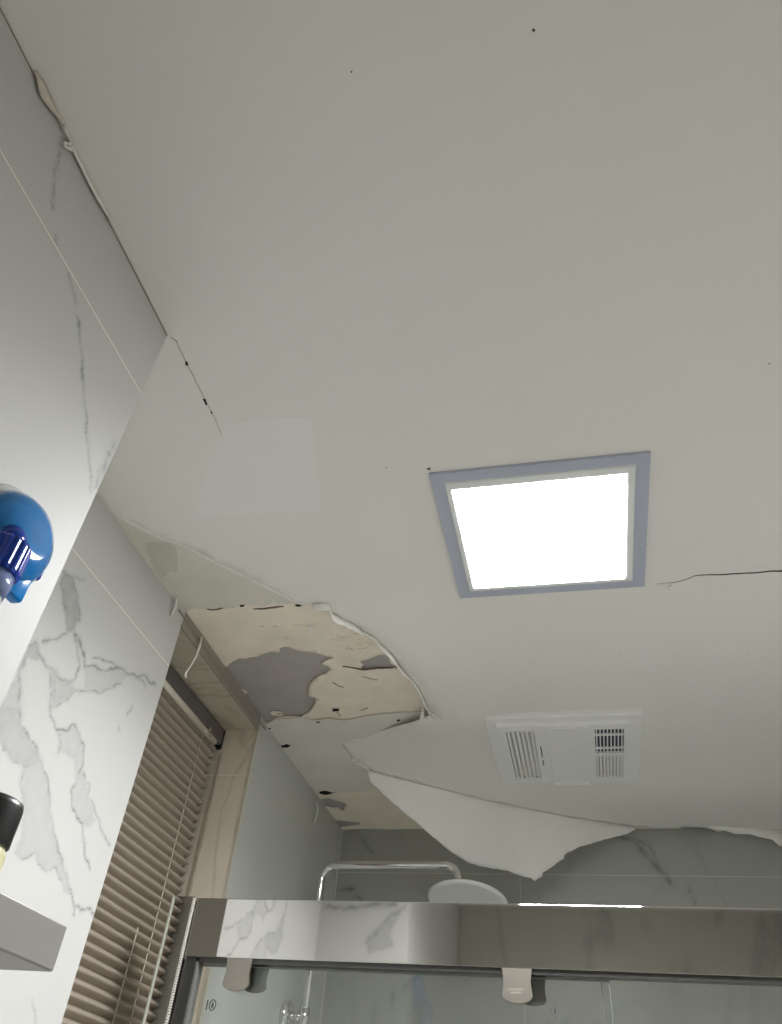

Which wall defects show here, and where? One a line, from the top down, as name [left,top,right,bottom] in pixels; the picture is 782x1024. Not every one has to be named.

peeling [0,8,170,336]
crack [170,337,222,435]
peeling [121,519,648,881]
crack [658,570,782,594]